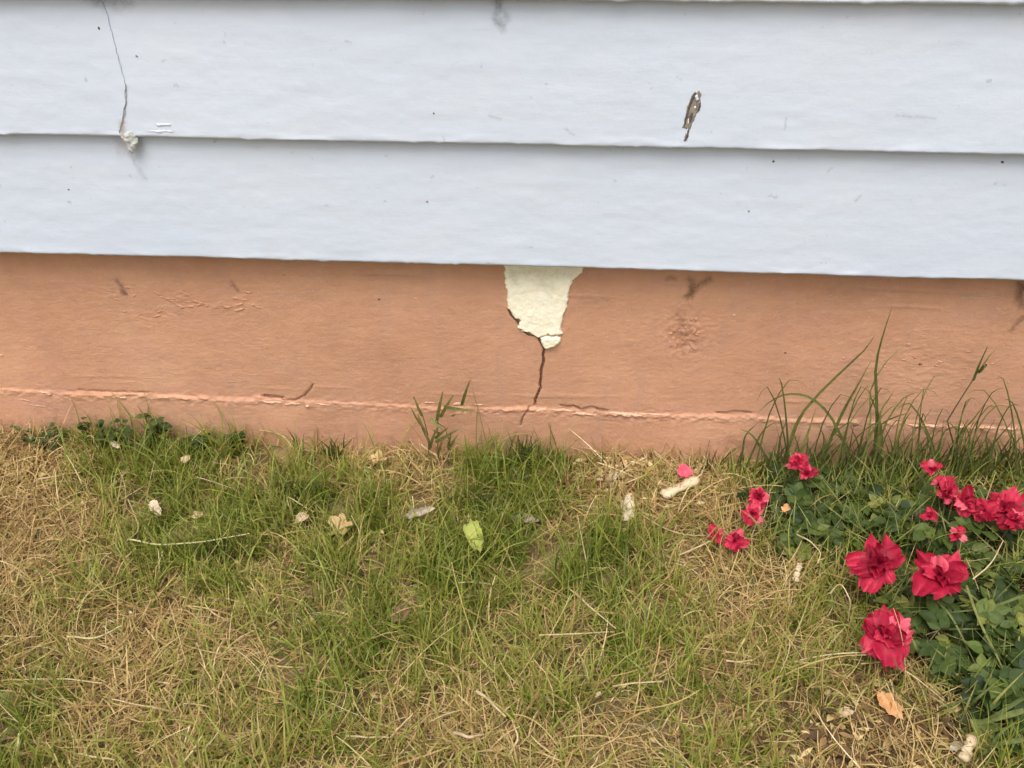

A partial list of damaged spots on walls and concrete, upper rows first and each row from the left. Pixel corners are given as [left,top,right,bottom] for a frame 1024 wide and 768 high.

crack [102,1,127,131]
peeling [682,91,702,141]
spalling [504,265,584,349]
crack [508,309,608,423]